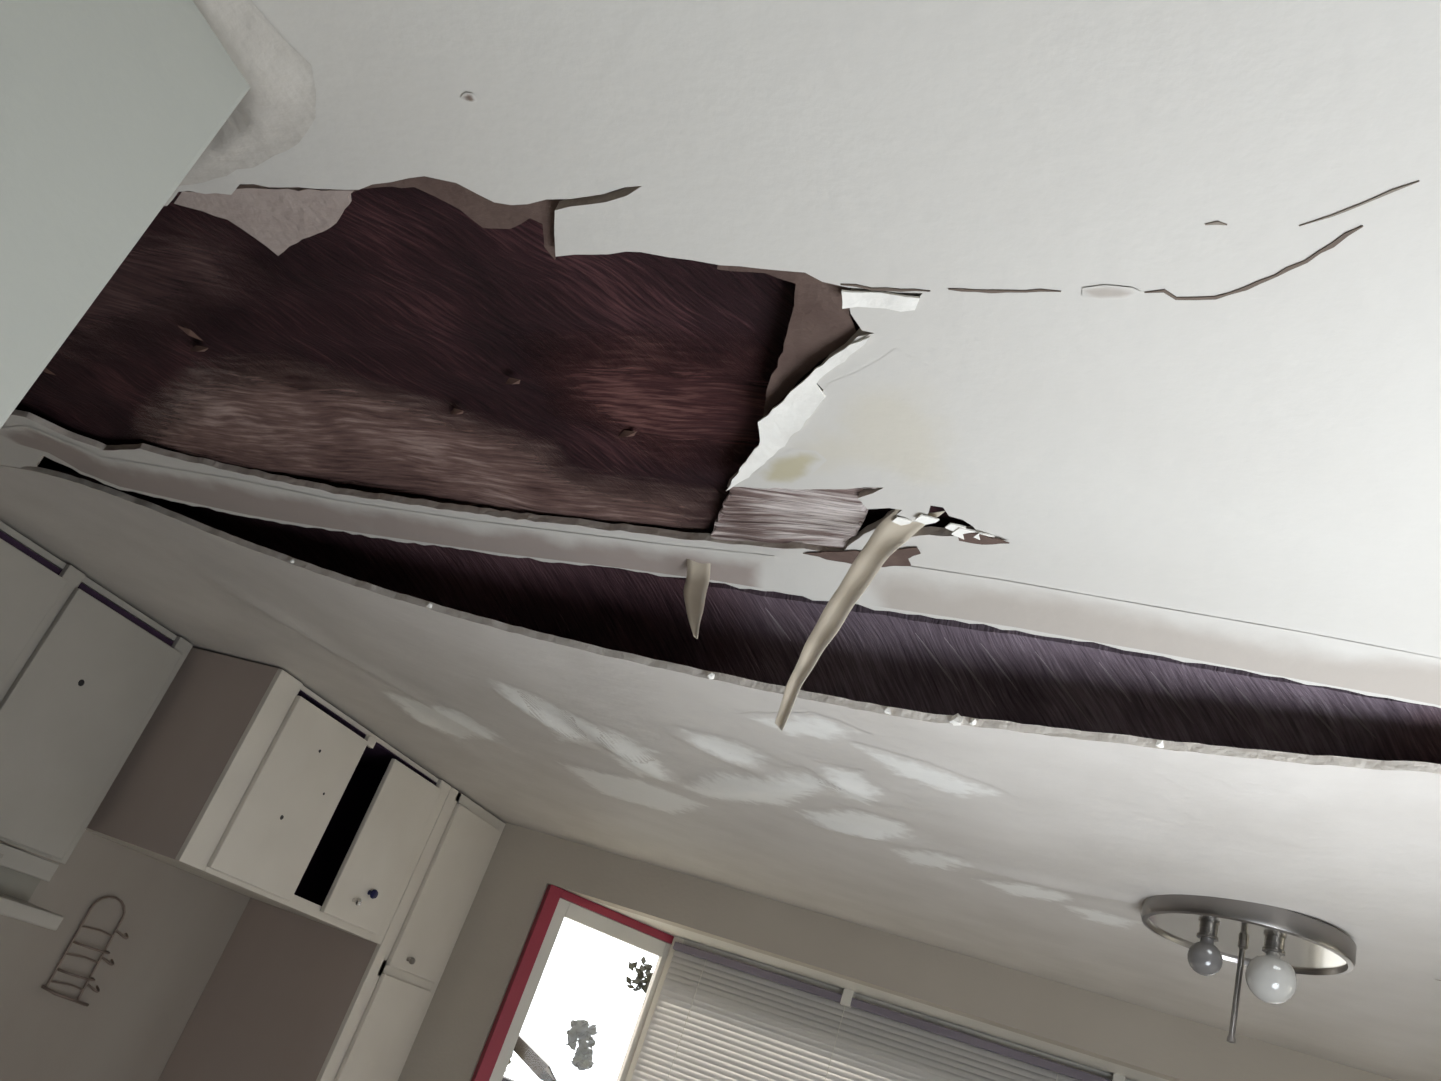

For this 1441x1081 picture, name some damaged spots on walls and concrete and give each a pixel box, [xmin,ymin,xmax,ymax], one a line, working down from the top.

flaking render [174,185,354,256]
crack [840,180,1419,300]
peeling [892,514,995,540]